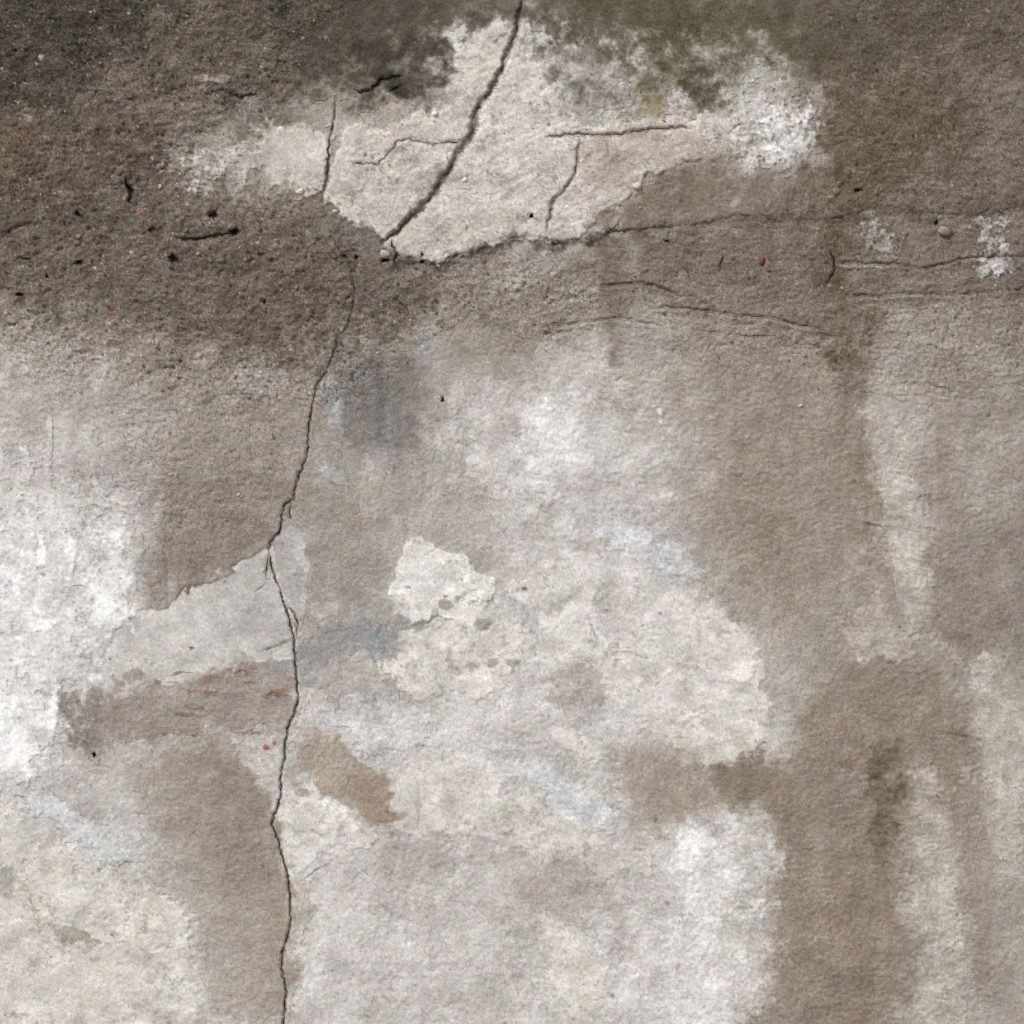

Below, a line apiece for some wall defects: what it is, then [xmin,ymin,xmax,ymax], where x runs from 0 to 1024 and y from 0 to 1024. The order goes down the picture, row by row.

peeling [192,72,231,85]
damp [0,42,640,1024]
flaking render [376,536,782,765]
crack [255,1,1024,1024]
damp [507,312,1024,1024]
damp [592,29,1024,293]